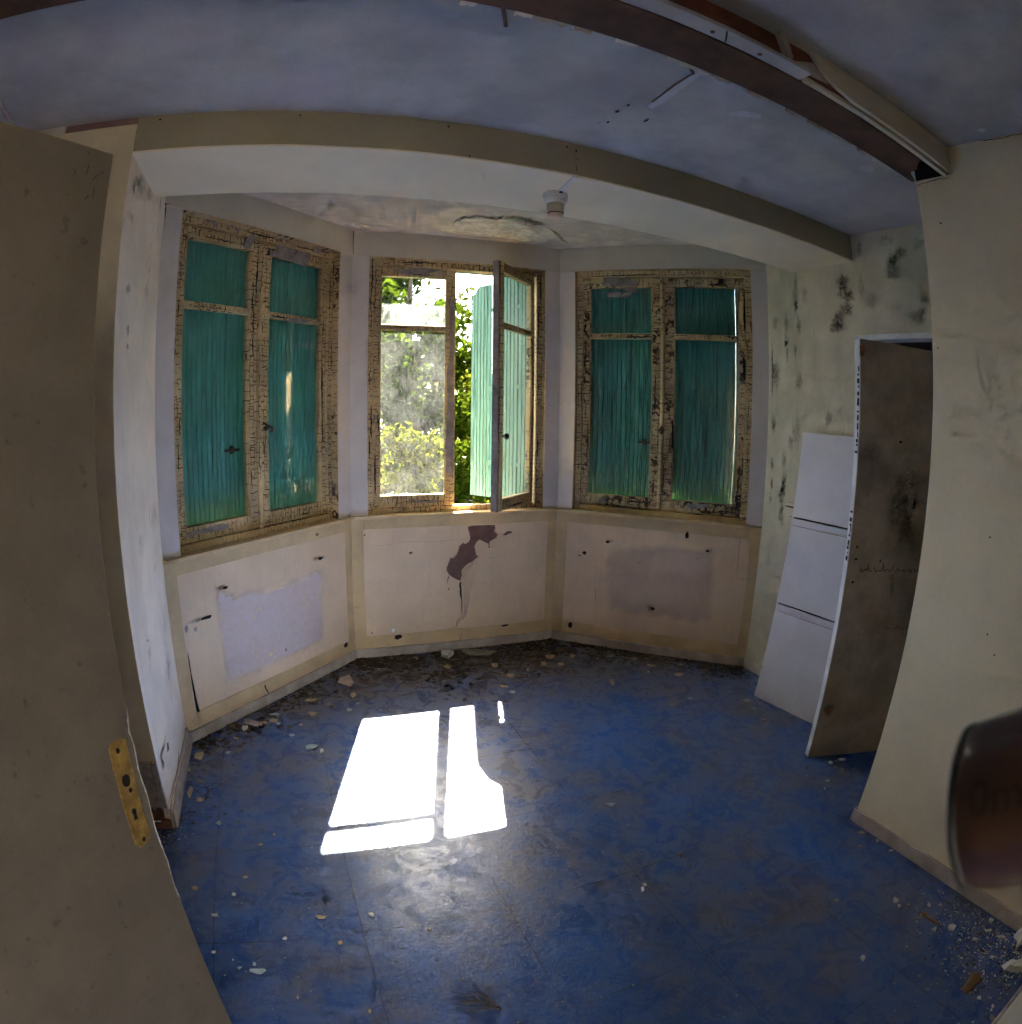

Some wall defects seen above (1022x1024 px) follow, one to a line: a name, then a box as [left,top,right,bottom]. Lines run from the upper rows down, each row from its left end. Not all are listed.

crack [149,199,545,549]
peeling [445,299,454,479]
crack [447,576,479,640]
peeling [445,524,512,582]